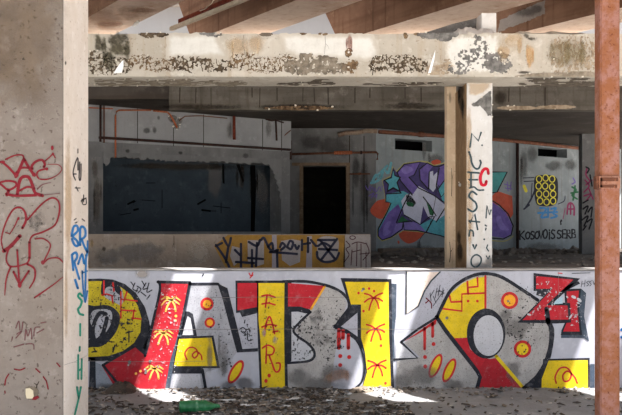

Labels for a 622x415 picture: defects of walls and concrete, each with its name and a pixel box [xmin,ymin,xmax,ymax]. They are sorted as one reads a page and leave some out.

damp [95,33,130,69]
spalling [88,48,359,87]
spalling [363,34,595,87]
spalling [471,91,576,117]
corrosion [600,178,618,188]